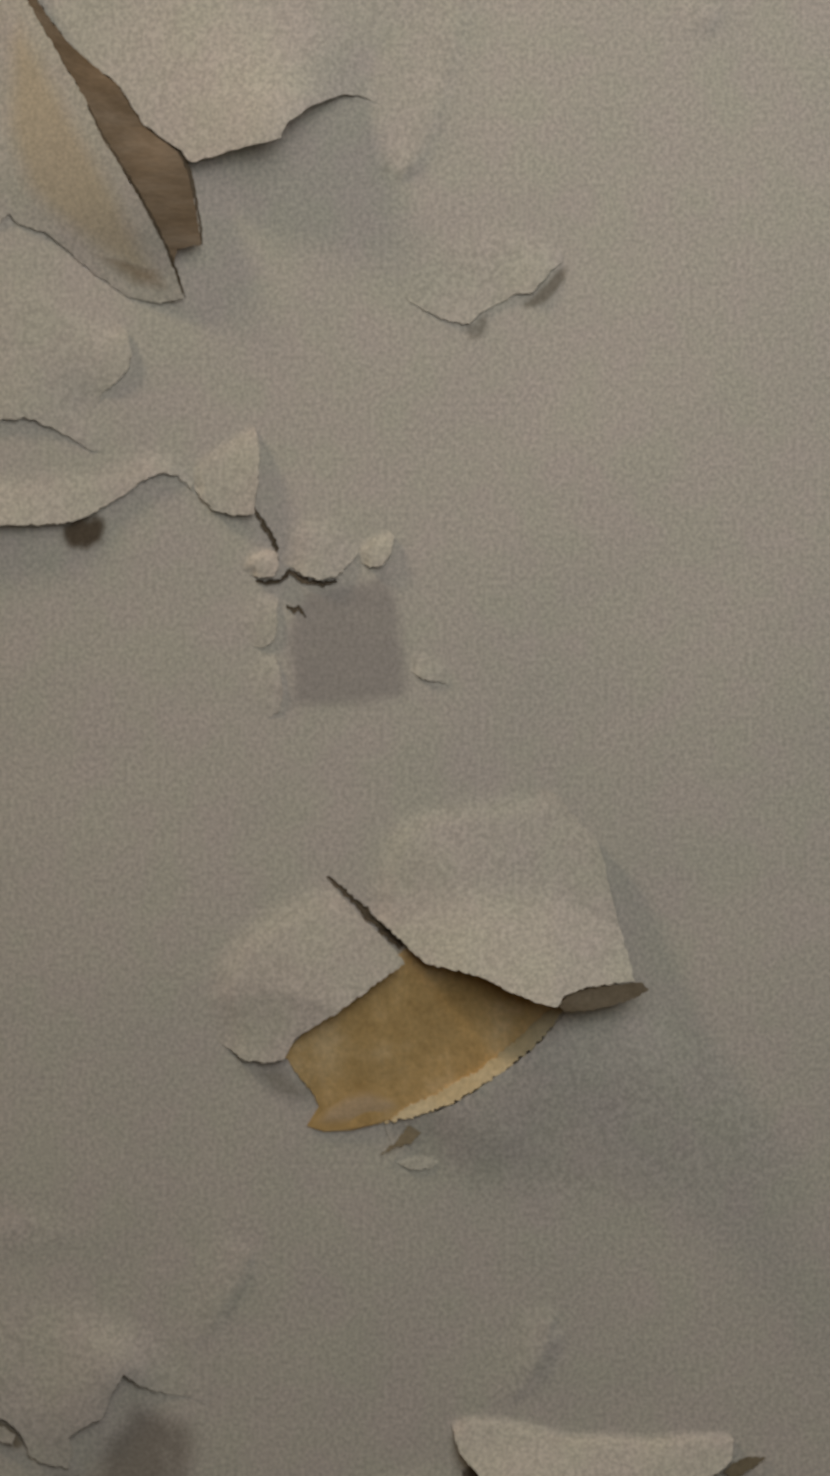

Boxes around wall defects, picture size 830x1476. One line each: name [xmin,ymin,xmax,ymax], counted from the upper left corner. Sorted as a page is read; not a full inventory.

peeling [0,0,431,304]
peeling [398,215,571,348]
peeling [0,268,260,559]
spalling [232,505,449,721]
peeling [198,786,830,1229]
peeling [0,1286,216,1476]
peeling [451,1412,765,1476]